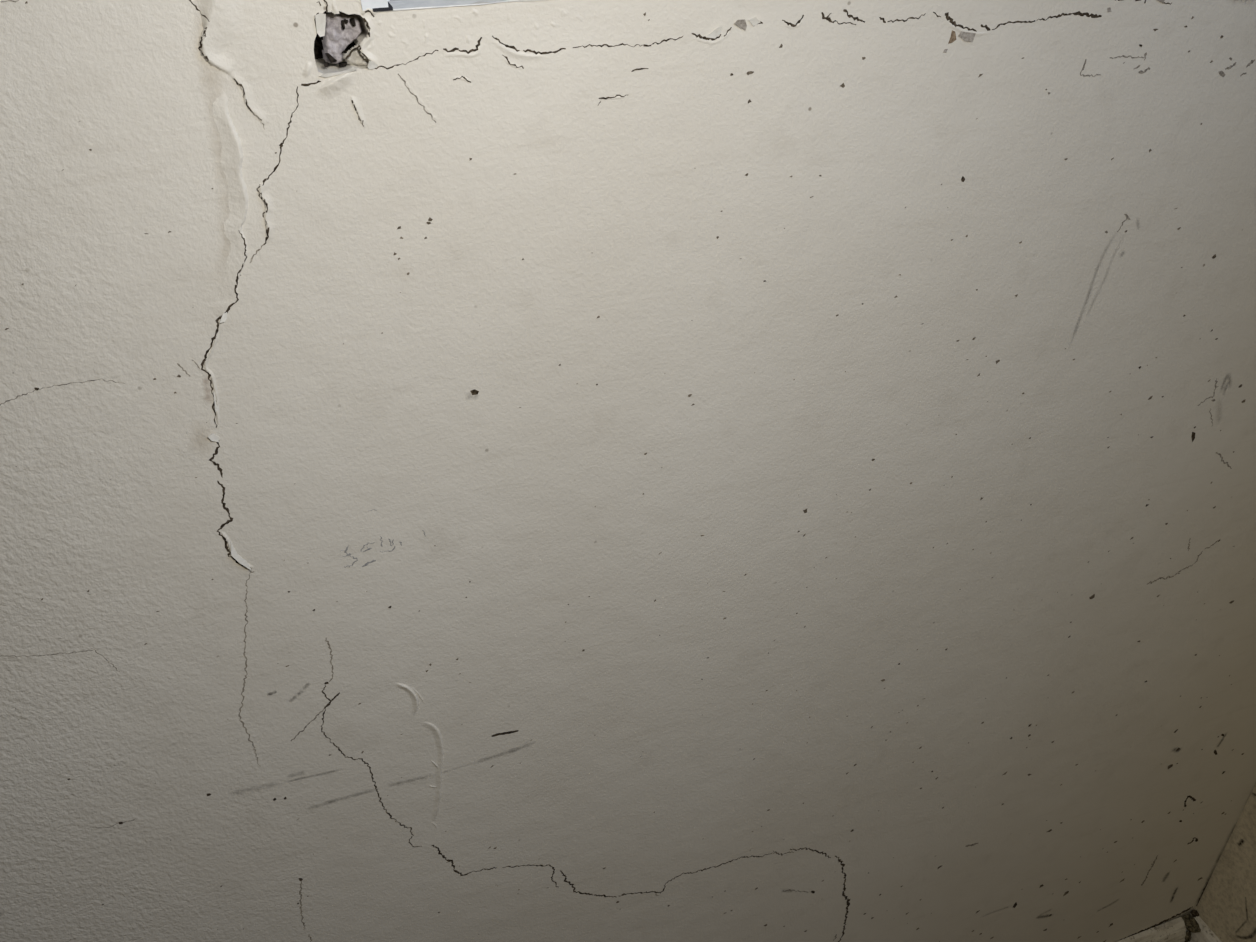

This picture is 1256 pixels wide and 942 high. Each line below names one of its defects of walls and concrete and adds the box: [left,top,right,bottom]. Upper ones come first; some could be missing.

spalling [301,2,379,128]
crack [323,0,361,14]
crack [375,0,1172,105]
crack [177,86,299,766]
crack [1147,538,1219,584]
crack [321,638,850,942]
crack [299,878,312,942]